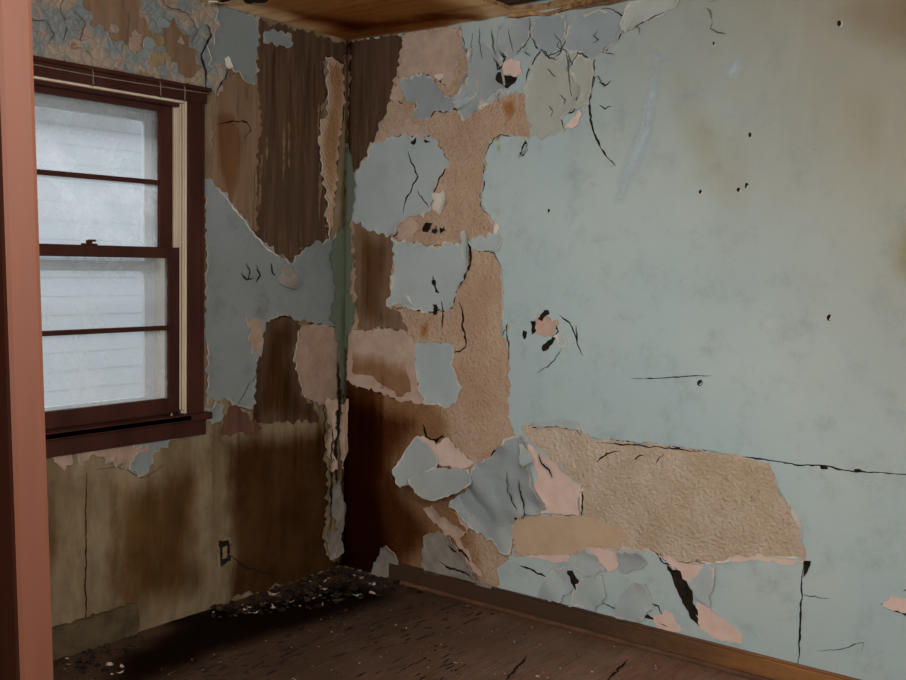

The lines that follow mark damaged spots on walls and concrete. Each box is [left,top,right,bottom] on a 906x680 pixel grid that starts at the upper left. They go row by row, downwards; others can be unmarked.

flaking render [201,0,811,644]
crack [734,454,906,475]
crack [798,562,830,660]
spalling [881,589,906,616]